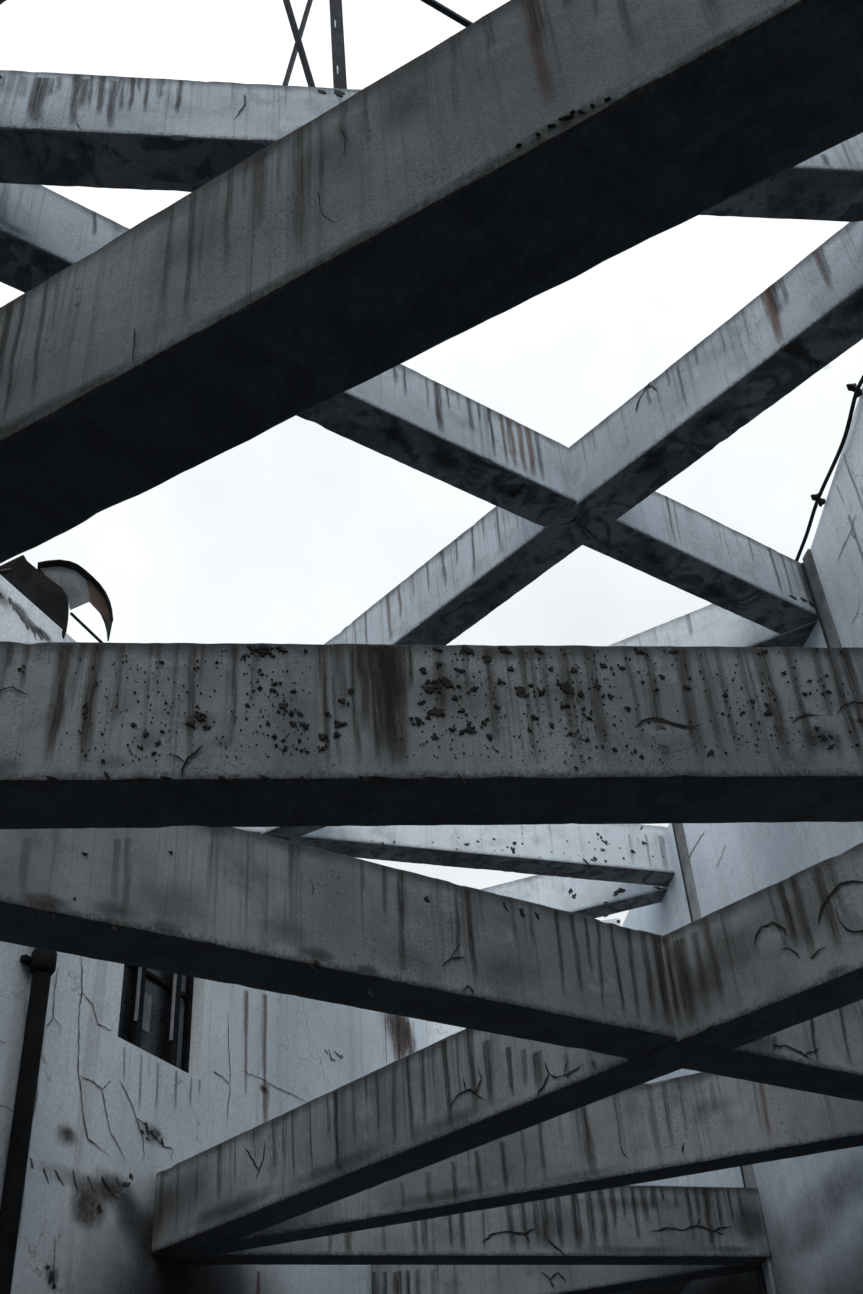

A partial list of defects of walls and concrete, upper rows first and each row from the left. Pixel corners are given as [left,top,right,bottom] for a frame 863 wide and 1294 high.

water stain [29,77,53,116]
water stain [71,74,149,118]
spalling [535,97,611,137]
rust [763,283,780,334]
spalling [393,645,854,786]
crack [635,710,703,731]
crack [754,880,863,959]
crack [47,956,173,1163]
crack [537,1061,580,1096]
crack [773,1044,819,1063]
crack [651,1219,733,1235]
crack [483,1227,566,1289]